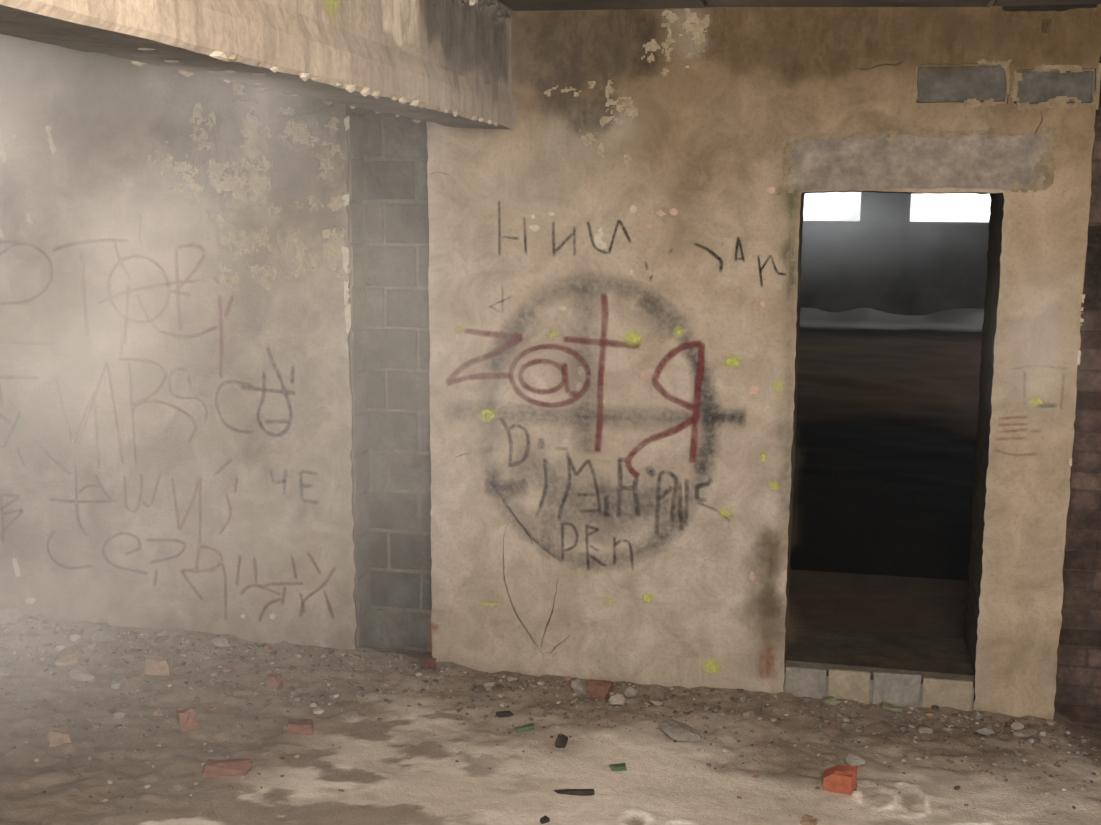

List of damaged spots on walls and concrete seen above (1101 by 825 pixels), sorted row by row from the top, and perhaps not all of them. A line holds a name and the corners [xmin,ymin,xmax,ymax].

spalling [454,0,512,27]
peeling [641,8,709,76]
peeling [544,80,638,157]